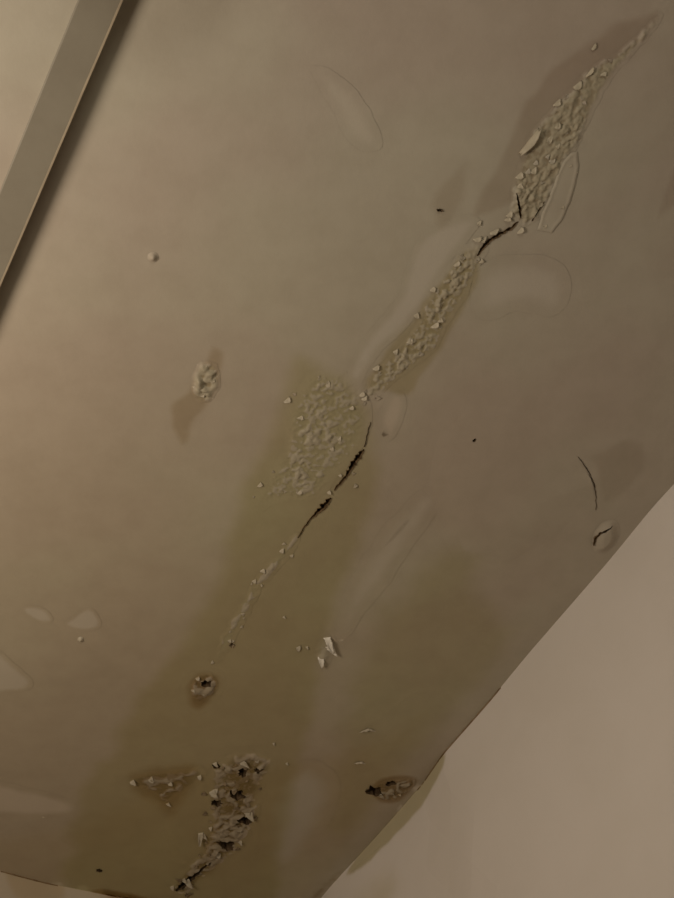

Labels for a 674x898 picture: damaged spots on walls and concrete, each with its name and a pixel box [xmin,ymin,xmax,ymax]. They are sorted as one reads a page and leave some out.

peeling [506,12,663,234]
crack [477,193,544,256]
peeling [359,221,489,406]
crack [298,422,371,537]
spalling [189,671,218,704]
spalling [128,742,289,898]
spalling [365,777,419,802]